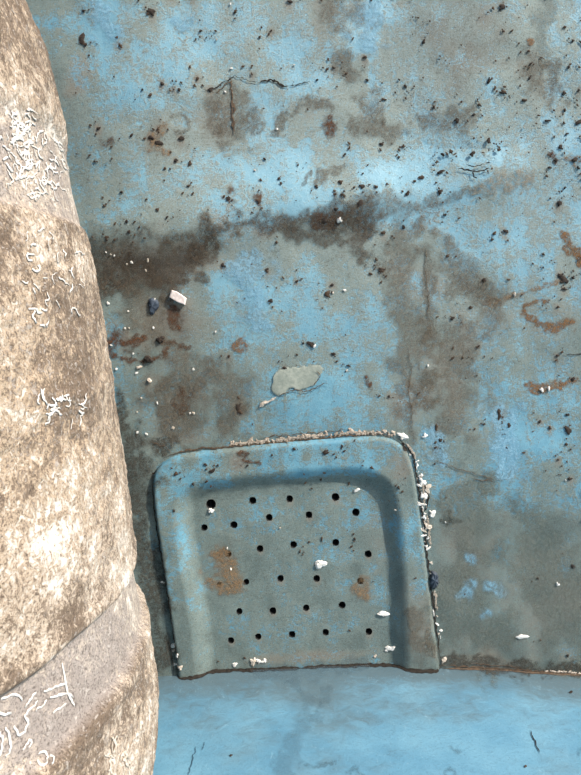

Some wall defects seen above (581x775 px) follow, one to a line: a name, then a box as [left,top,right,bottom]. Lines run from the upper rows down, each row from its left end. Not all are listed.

crack [202,74,309,132]
corrosion [561,231,581,267]
corrosion [483,281,575,333]
peeling [259,364,328,407]
water stain [90,195,438,672]
crack [152,352,581,680]
corrosion [205,548,243,595]
water stain [422,472,581,682]